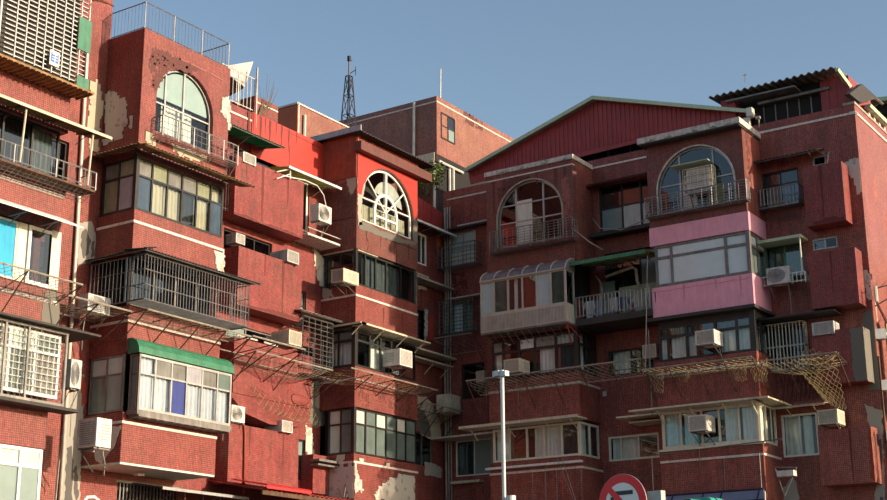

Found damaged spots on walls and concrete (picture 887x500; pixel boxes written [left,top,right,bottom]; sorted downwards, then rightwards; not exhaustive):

peeling [86,79,134,153]
peeling [220,95,232,131]
peeling [845,158,862,194]
peeling [77,221,96,265]
peeling [849,268,880,390]
peeling [324,453,364,499]
peeling [374,462,442,500]